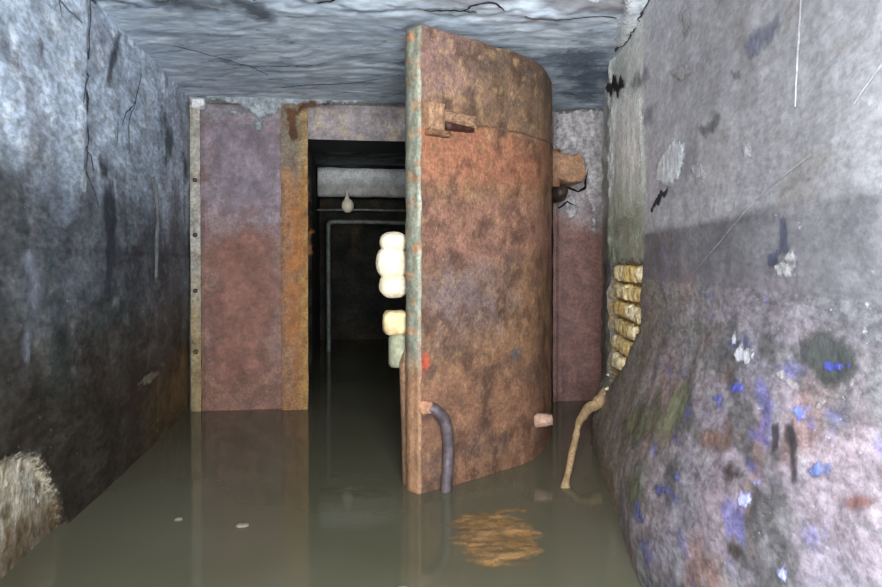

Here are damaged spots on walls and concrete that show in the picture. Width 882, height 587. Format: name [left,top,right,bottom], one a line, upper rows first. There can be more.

crack [424,1,504,13]
crack [525,0,650,52]
peeling [616,0,648,50]
crack [59,0,99,208]
crack [117,73,142,154]
crack [173,45,378,88]
corrosion [287,101,327,140]
crack [606,74,624,99]